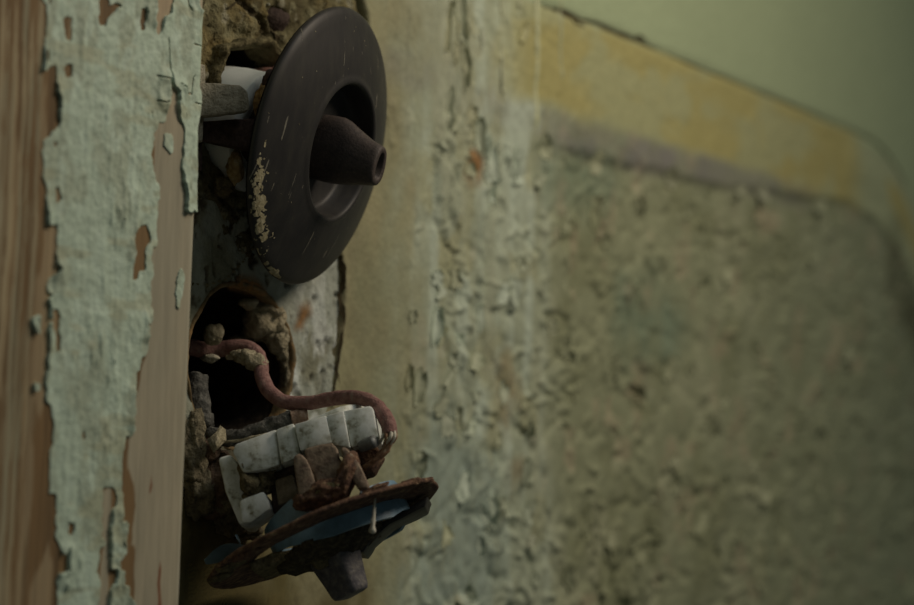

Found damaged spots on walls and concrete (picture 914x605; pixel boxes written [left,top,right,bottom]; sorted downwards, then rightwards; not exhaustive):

peeling [435,0,549,208]
peeling [31,0,358,605]
peeling [496,256,529,308]
peeling [431,268,485,440]
peeling [405,363,428,407]
peeling [456,470,471,503]
peeling [454,584,477,605]